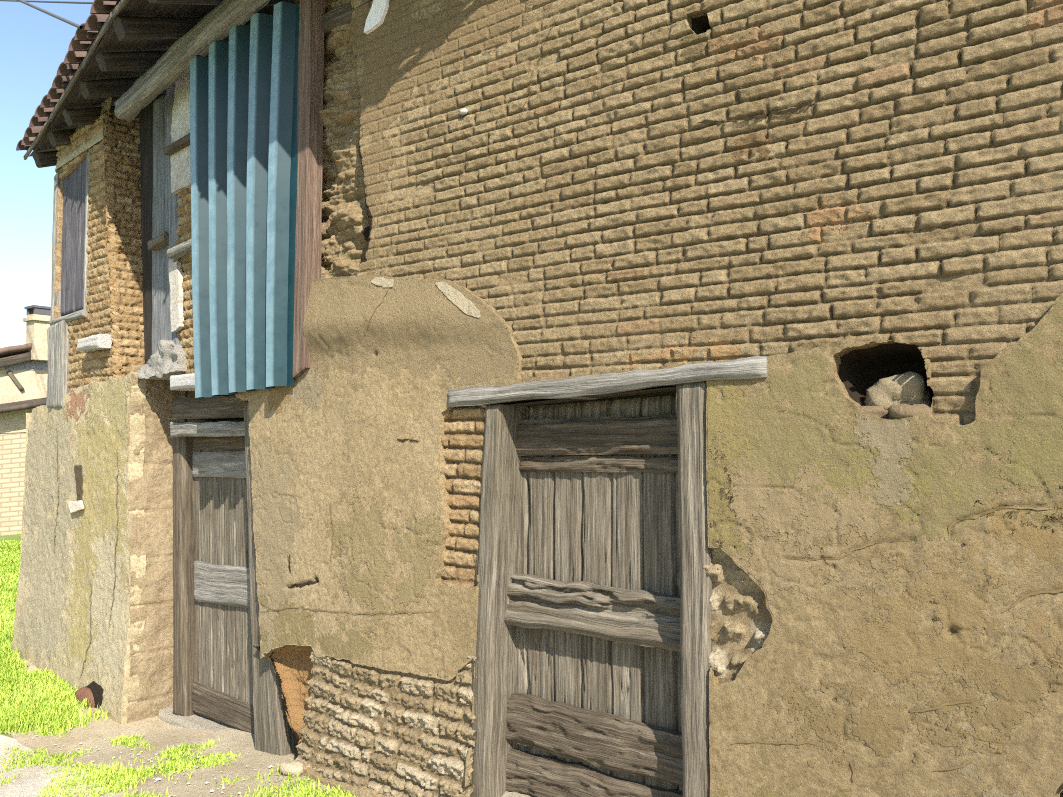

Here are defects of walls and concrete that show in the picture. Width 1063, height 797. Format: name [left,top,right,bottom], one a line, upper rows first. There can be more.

peeling [348,0,557,288]
spalling [435,282,481,318]
flaking render [439,404,493,587]
flaking render [703,547,773,683]
water stain [708,413,925,635]
crack [787,539,912,561]
flaking render [267,645,479,797]